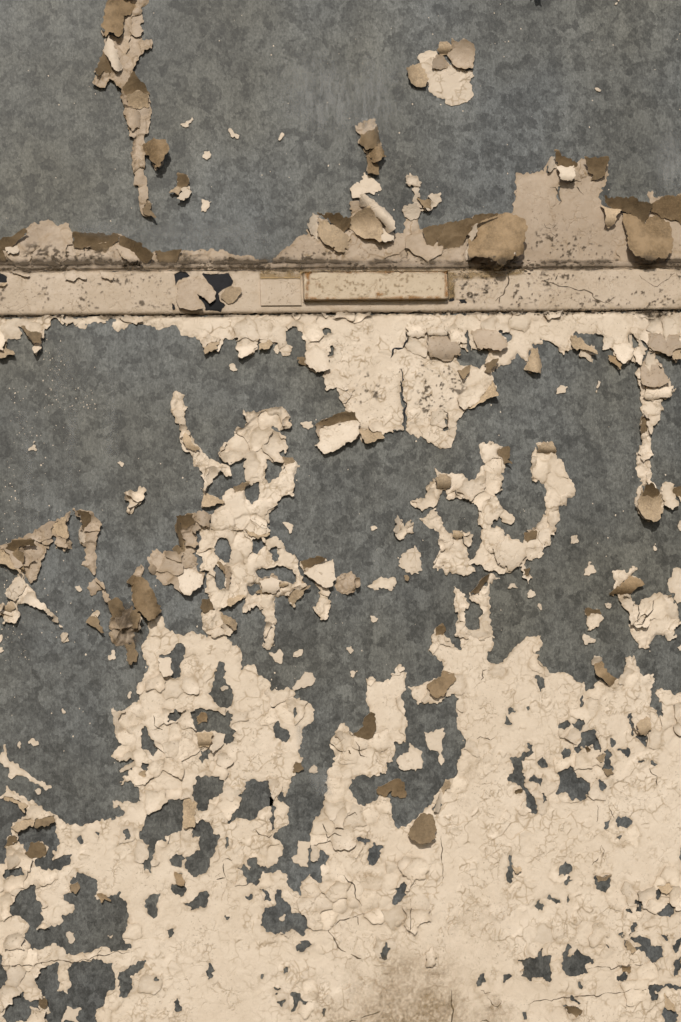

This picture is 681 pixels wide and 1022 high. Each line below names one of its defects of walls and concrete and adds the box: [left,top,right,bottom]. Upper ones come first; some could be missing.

peeling [92,0,169,218]
peeling [406,38,475,106]
peeling [0,118,681,522]
peeling [0,391,681,1022]
crack [1,951,133,967]
crack [328,876,361,959]
crack [480,963,647,1022]